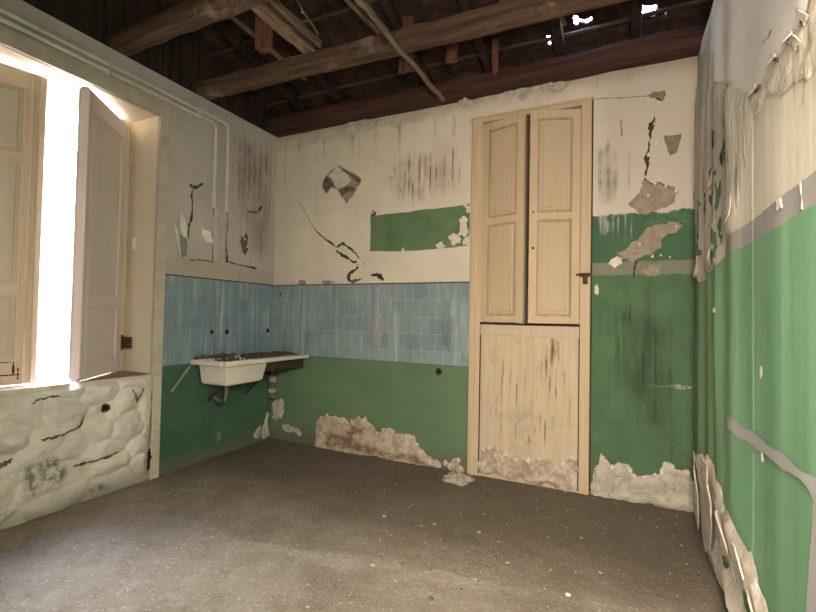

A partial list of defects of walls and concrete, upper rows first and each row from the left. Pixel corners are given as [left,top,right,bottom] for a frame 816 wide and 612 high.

peeling [711,0,816,116]
crack [599,90,666,177]
spalling [322,165,361,204]
crack [296,199,384,283]
peeling [609,178,695,276]
crack [0,459,13,469]
crack [41,415,85,441]
crack [73,452,118,467]
crack [132,388,152,471]
peeling [315,414,465,472]
peeling [590,451,768,612]
peeling [724,407,816,612]